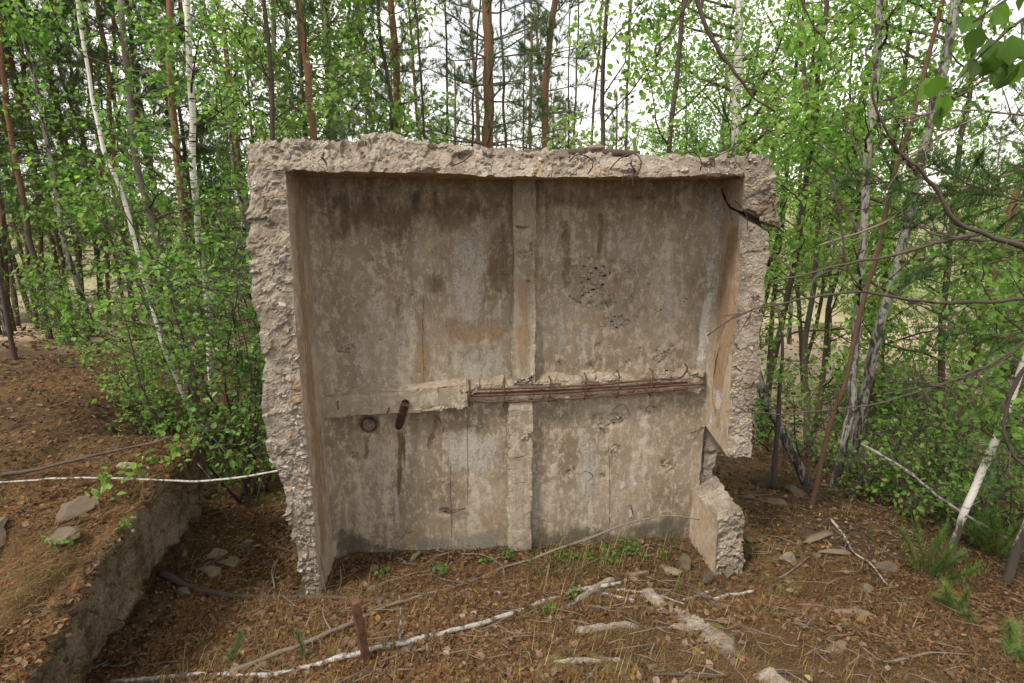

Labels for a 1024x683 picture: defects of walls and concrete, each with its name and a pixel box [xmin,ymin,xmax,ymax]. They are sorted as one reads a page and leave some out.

crack [721,188,743,220]
spalling [568,263,638,346]
corrosion [396,432,406,495]